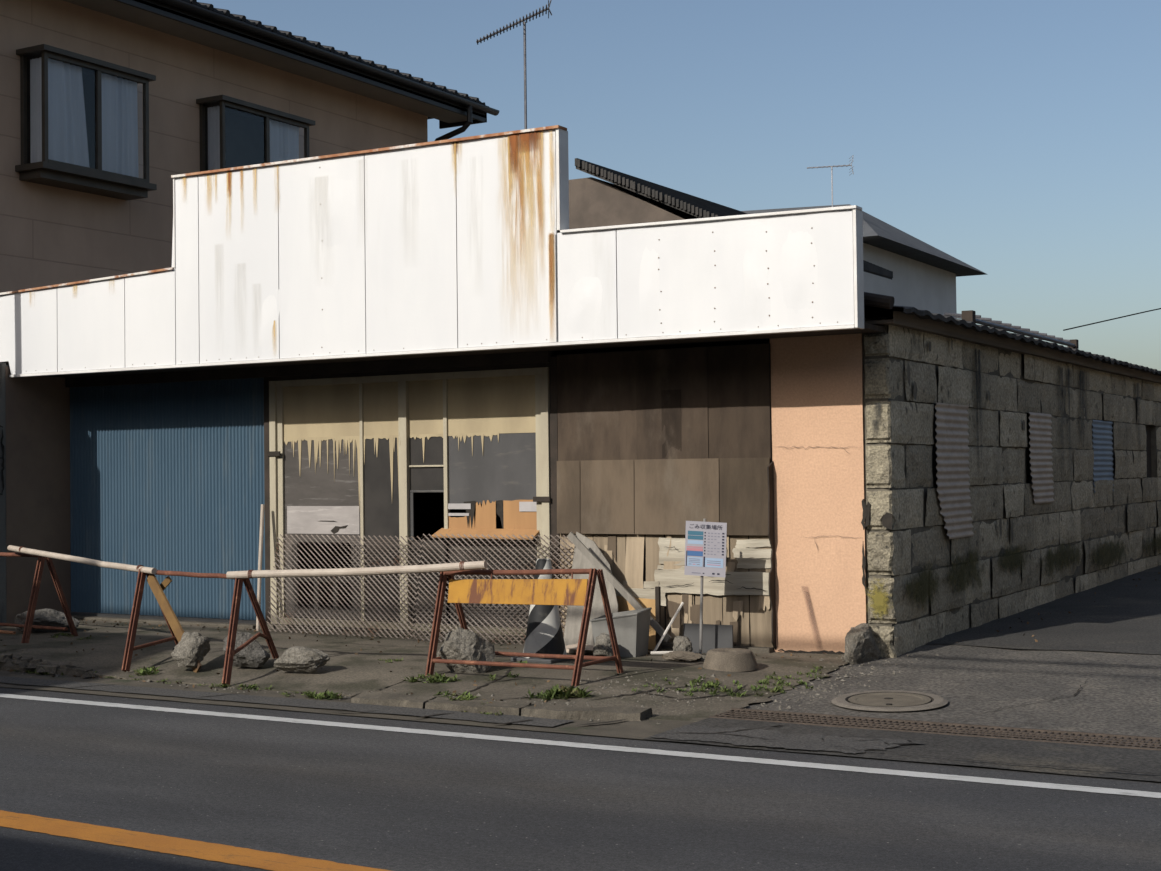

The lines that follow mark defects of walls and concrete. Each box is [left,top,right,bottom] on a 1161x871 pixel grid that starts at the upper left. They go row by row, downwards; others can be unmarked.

corrosion [207,168,256,196]
corrosion [508,131,553,202]